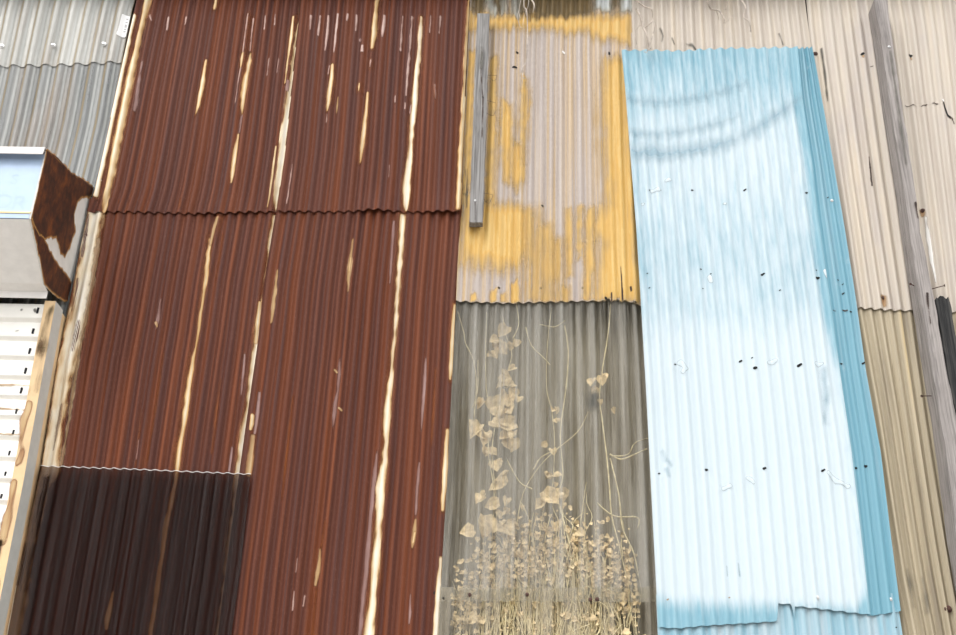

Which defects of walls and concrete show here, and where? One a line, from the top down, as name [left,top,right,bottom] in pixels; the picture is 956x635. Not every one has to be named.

corrosion [133,61,143,111]
corrosion [31,149,93,321]
corrosion [36,334,47,357]